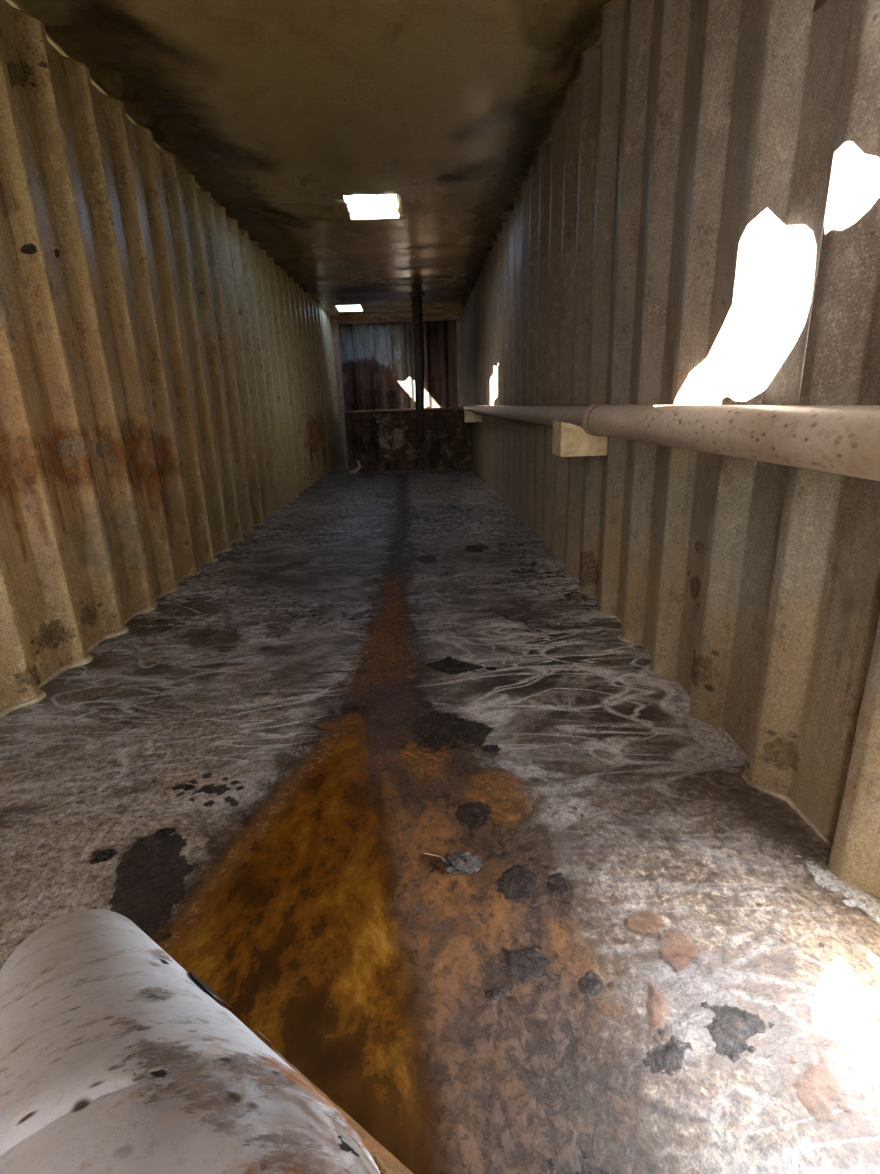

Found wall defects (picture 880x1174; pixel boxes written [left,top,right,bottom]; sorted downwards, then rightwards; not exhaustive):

water stain [24,0,613,306]
corrosion [147,474,684,1174]
water stain [677,706,799,771]